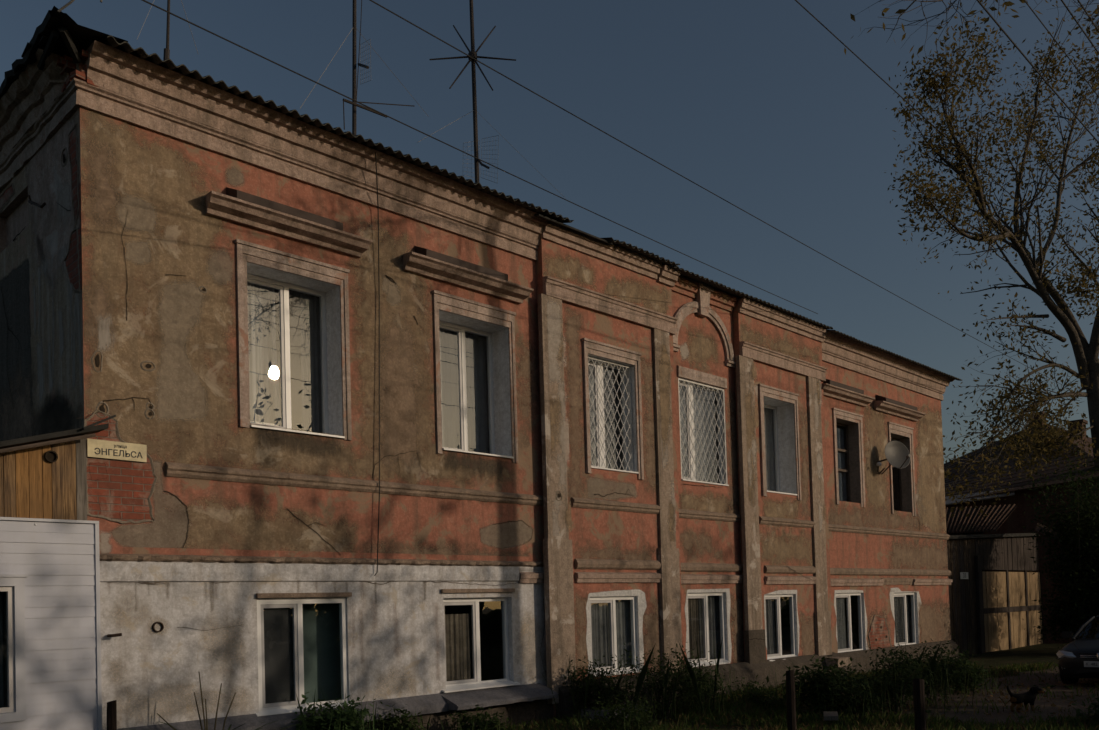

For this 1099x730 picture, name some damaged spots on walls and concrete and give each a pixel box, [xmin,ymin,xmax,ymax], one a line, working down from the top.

peeling [64,111,528,557]
crack [287,508,339,553]